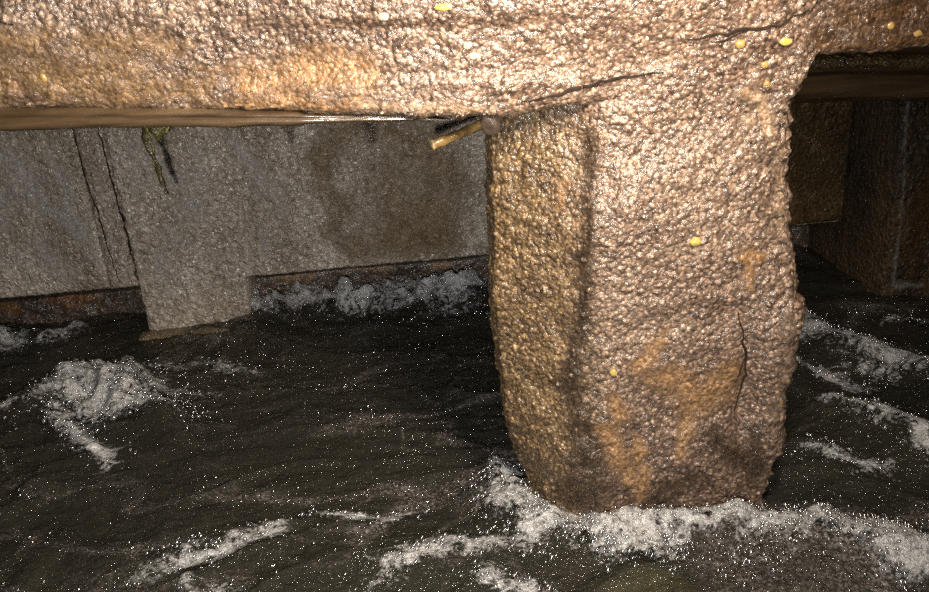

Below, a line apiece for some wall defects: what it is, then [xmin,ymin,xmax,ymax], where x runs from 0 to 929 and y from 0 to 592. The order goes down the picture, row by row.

crack [522,72,663,102]
crack [72,128,138,283]